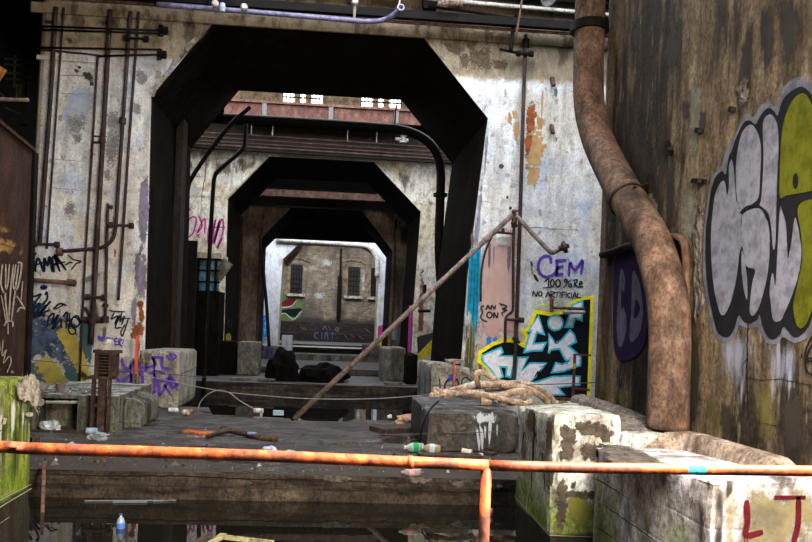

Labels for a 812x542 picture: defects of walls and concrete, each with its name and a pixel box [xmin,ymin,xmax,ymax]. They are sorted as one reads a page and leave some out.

water stain [0,402,29,442]
spalling [16,373,41,417]
water stain [690,335,733,439]
water stain [758,343,803,455]